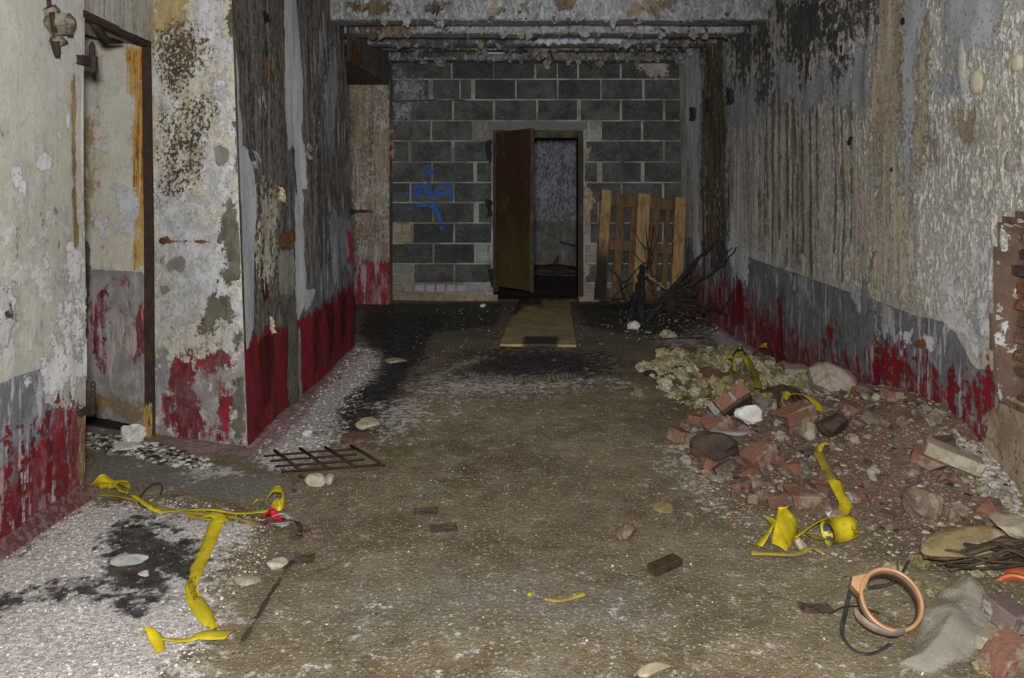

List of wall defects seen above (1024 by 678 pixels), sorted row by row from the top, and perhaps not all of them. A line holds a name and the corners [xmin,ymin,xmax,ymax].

peeling [11,166,27,196]
corrosion [71,76,101,249]
corrosion [126,45,144,271]
damp [151,0,220,202]
peeling [141,0,262,361]
peeling [251,0,742,407]
damp [667,0,883,332]
peeling [890,0,1023,195]
peeling [0,281,19,354]
peeling [22,240,91,412]
spalling [229,376,246,445]
flaking render [836,211,1024,497]